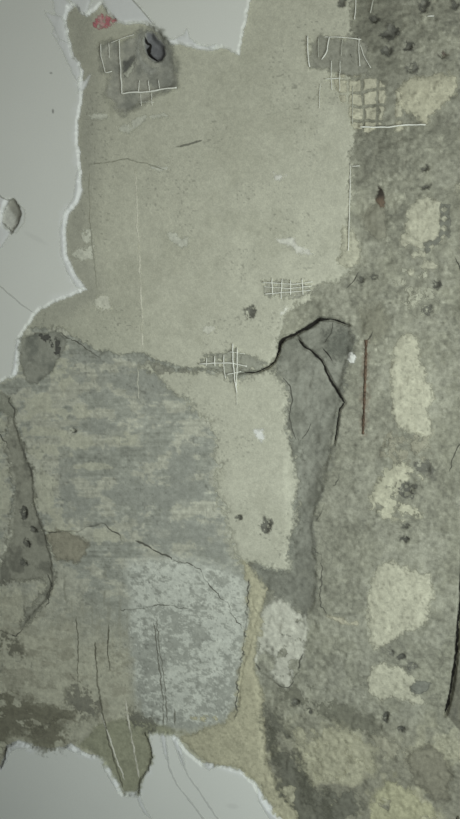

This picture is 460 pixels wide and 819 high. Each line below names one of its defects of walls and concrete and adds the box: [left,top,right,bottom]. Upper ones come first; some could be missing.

peeling [0,0,369,770]
crack [245,318,348,440]
crack [105,524,223,600]
crack [235,581,260,670]
crack [445,582,460,712]
water stain [280,684,380,738]
flaking render [101,758,149,817]
flaking render [250,778,282,819]
water stain [266,710,361,819]